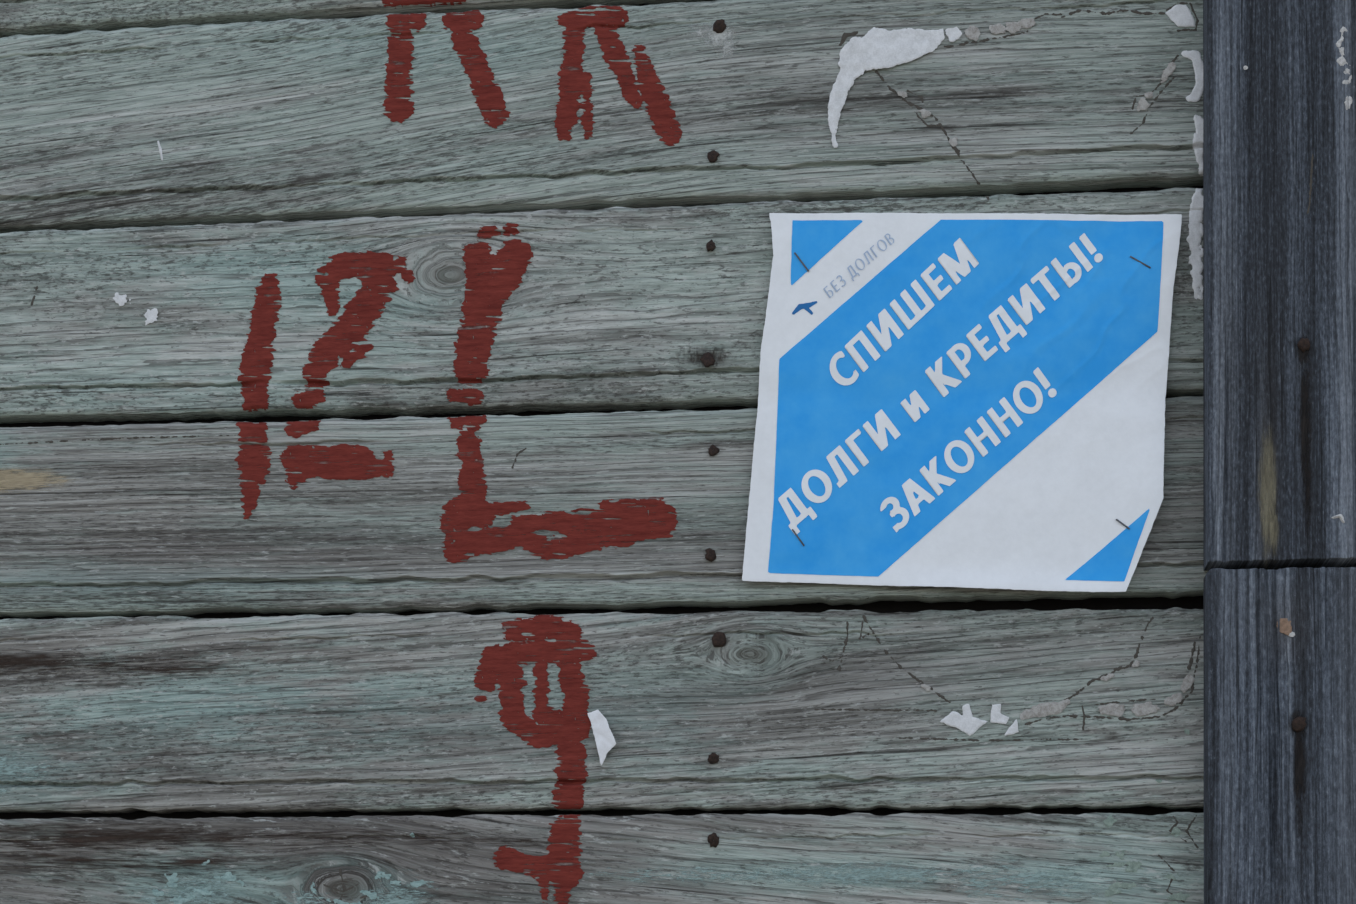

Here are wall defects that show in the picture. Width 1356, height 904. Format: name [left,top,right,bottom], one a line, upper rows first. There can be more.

crack [875,70,989,200]
crack [815,615,1079,742]
crack [1064,617,1154,700]